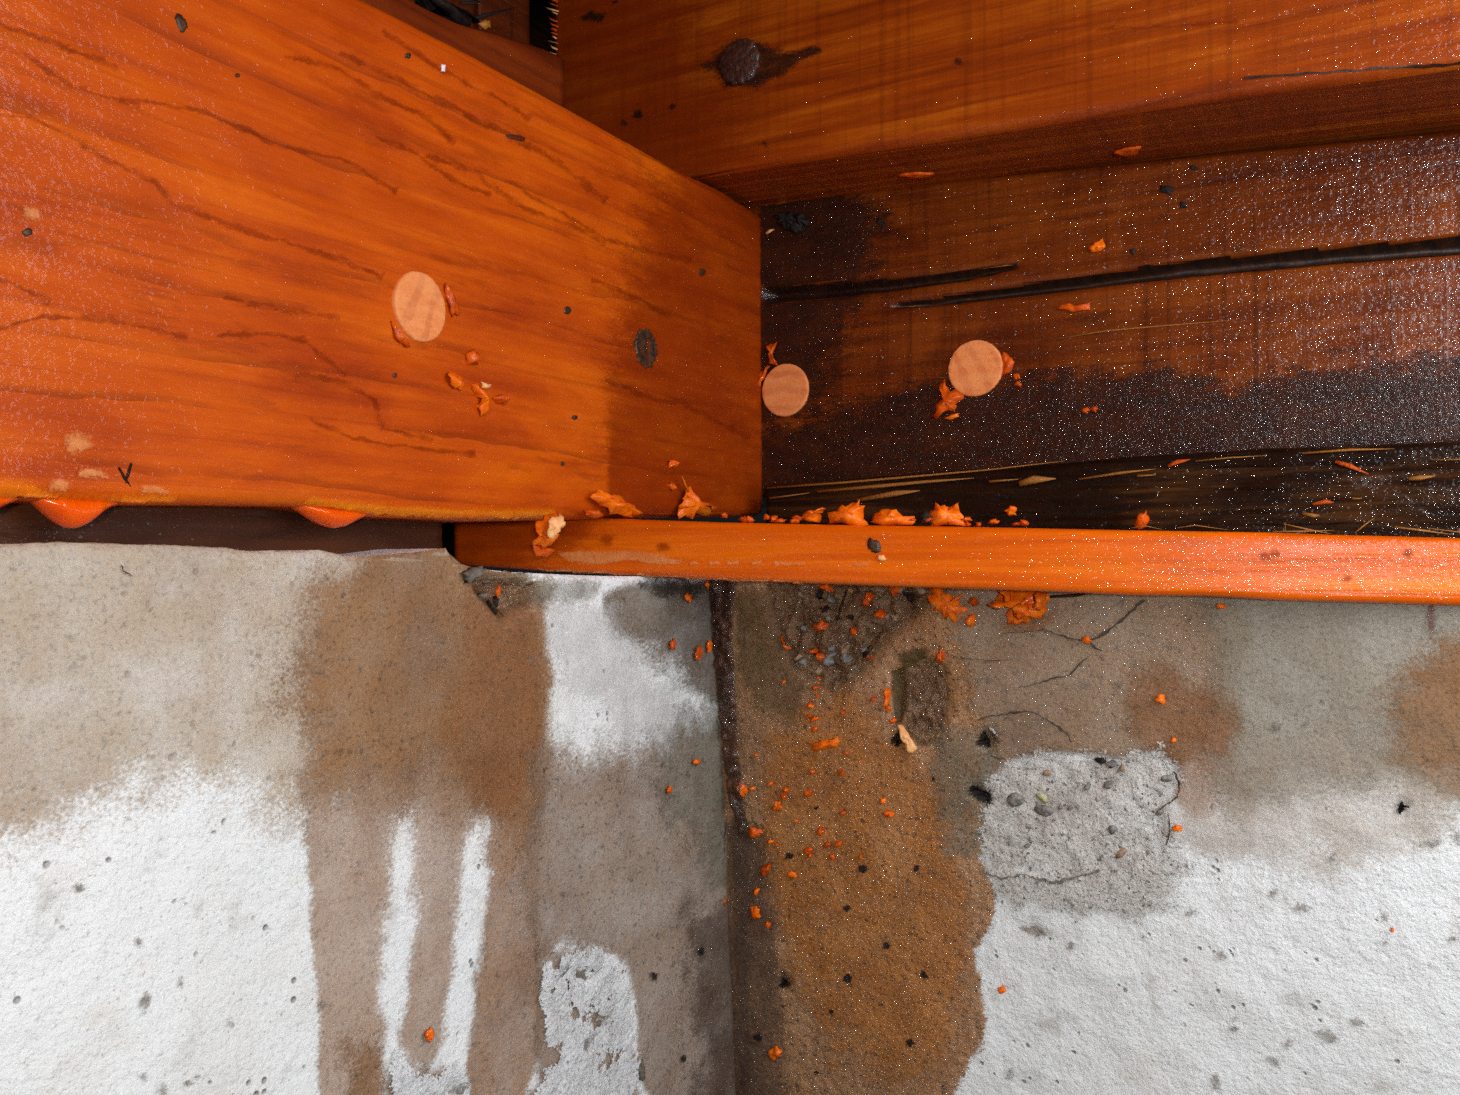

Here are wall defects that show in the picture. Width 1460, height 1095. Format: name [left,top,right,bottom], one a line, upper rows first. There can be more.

leakage [0,542,751,1095]
rust [718,580,997,1095]
crack [980,869,1100,885]
crack [961,599,1145,760]
spalling [974,741,1216,940]
crack [1159,772,1180,846]
leakage [936,588,1460,855]